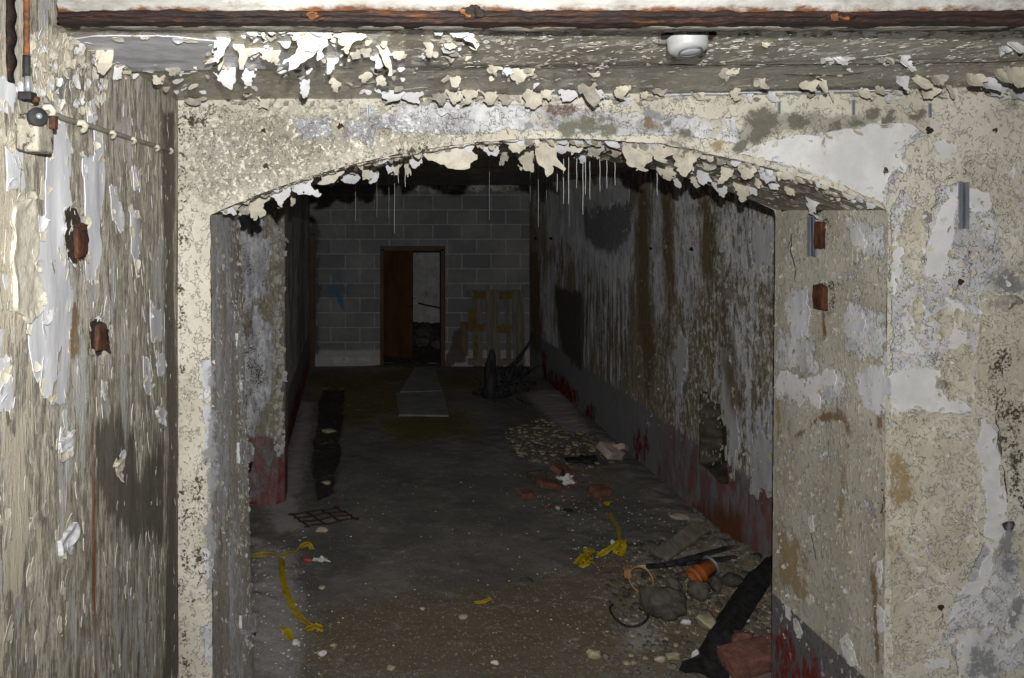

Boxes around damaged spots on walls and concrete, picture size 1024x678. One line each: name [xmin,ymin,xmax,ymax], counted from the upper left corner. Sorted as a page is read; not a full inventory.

leakage [94,102,253,678]
peeling [0,28,1024,499]
leakage [529,251,540,355]
leakage [555,287,581,369]
peeling [200,119,1024,678]
leakage [583,189,653,383]
leakage [663,193,673,307]
leakage [701,203,715,280]
peeling [0,458,13,550]
peeling [25,513,84,671]
peeling [104,522,177,674]